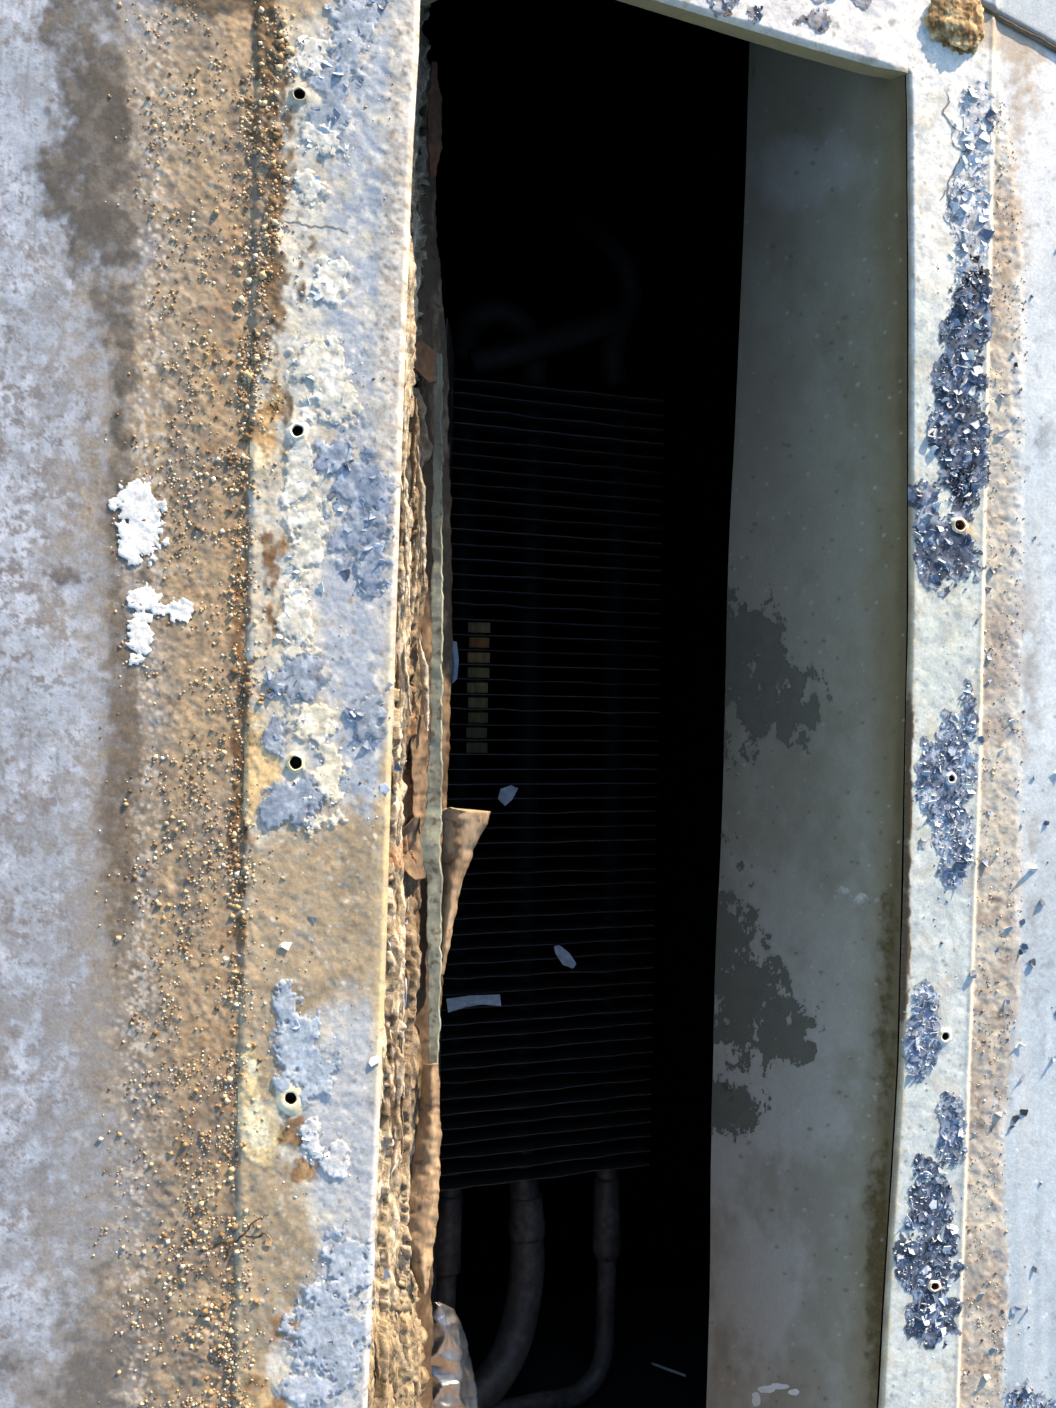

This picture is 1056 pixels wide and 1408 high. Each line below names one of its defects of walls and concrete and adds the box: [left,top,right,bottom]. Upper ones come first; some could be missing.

corrosion [250,0,315,332]
corrosion [250,376,293,471]
peeling [908,73,1022,598]
peeling [257,322,402,838]
corrosion [227,533,288,848]
peeling [911,679,992,888]
crack [197,1215,268,1262]
corrosion [238,1050,318,1182]
corrosion [272,1317,297,1341]
peeling [267,979,351,1179]
peeling [274,1219,391,1408]
peeling [892,979,985,1349]